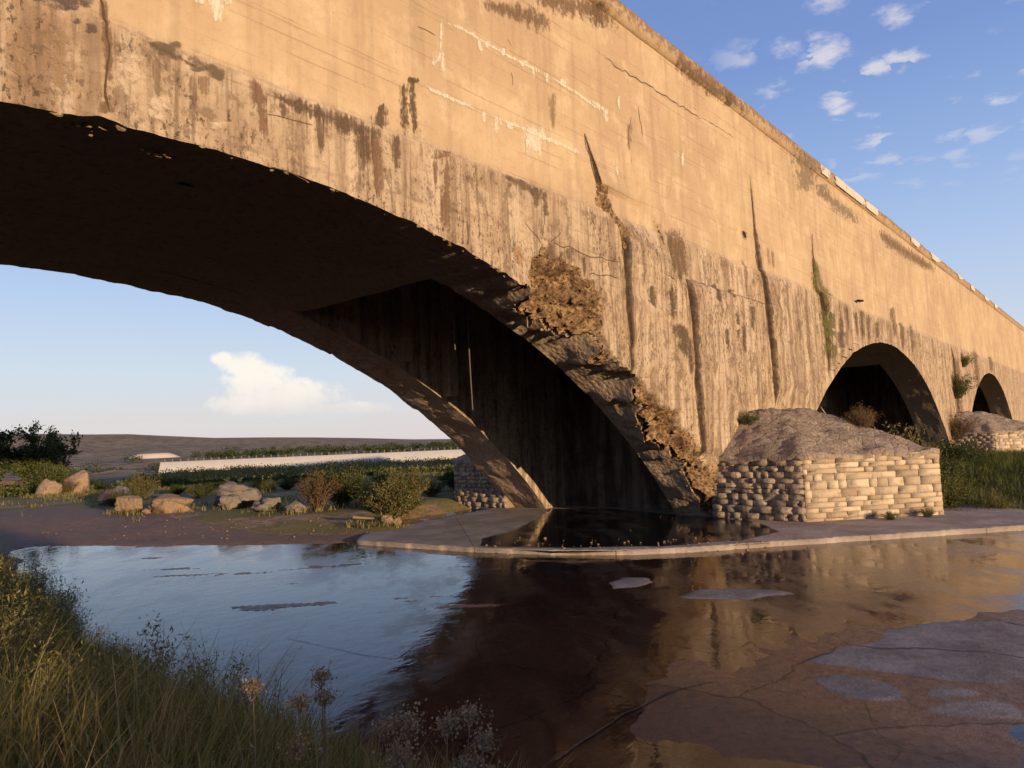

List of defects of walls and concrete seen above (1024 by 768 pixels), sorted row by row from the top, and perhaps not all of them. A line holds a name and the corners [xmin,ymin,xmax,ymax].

crack [100,0,113,110]
leakage [149,41,225,108]
leakage [278,77,419,171]
efflorescence [432,23,620,122]
leakage [485,0,613,30]
spalling [514,247,628,371]
crack [525,58,776,475]
leakage [665,228,700,371]
leakage [726,307,755,353]
leakage [838,308,879,351]
leakage [879,231,932,270]
spalling [633,381,717,514]